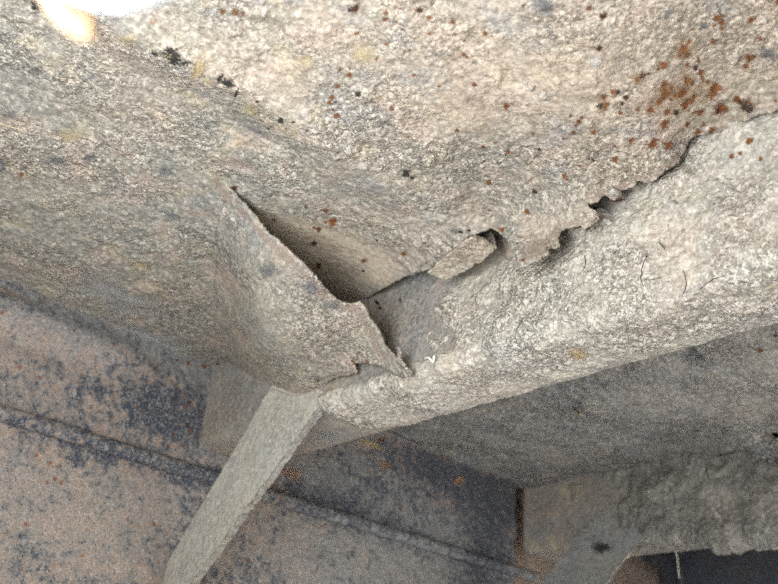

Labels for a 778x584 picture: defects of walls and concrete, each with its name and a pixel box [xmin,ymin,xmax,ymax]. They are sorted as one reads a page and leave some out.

corrosion [596,89,629,115]
corrosion [635,39,756,135]